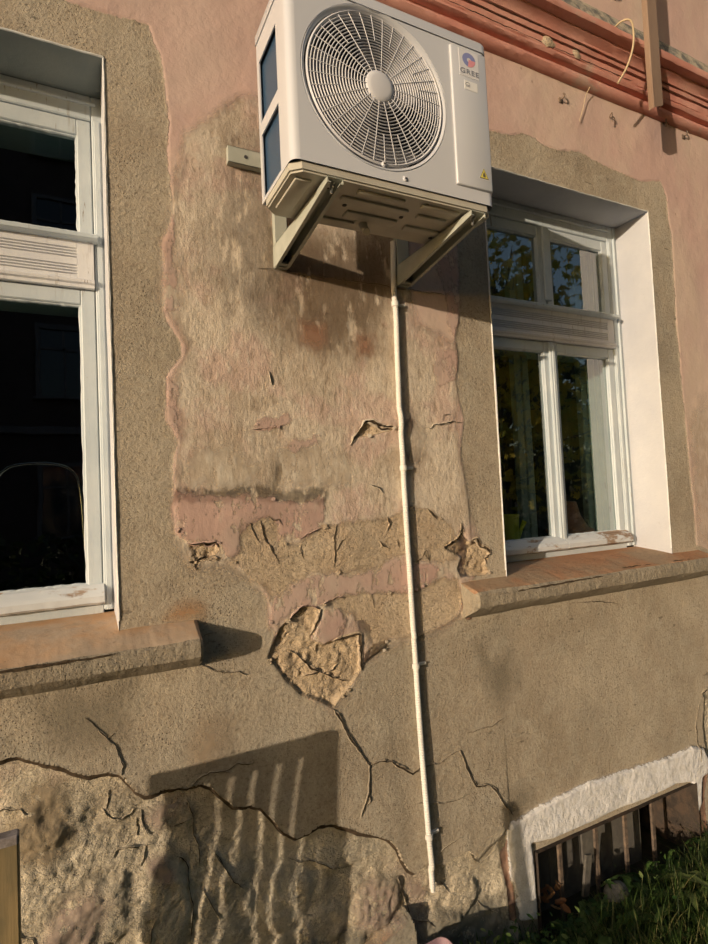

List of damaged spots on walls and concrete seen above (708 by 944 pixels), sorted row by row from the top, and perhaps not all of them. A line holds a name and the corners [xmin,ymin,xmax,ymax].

peeling [161,96,491,712]
crack [350,418,393,445]
crack [0,709,513,940]